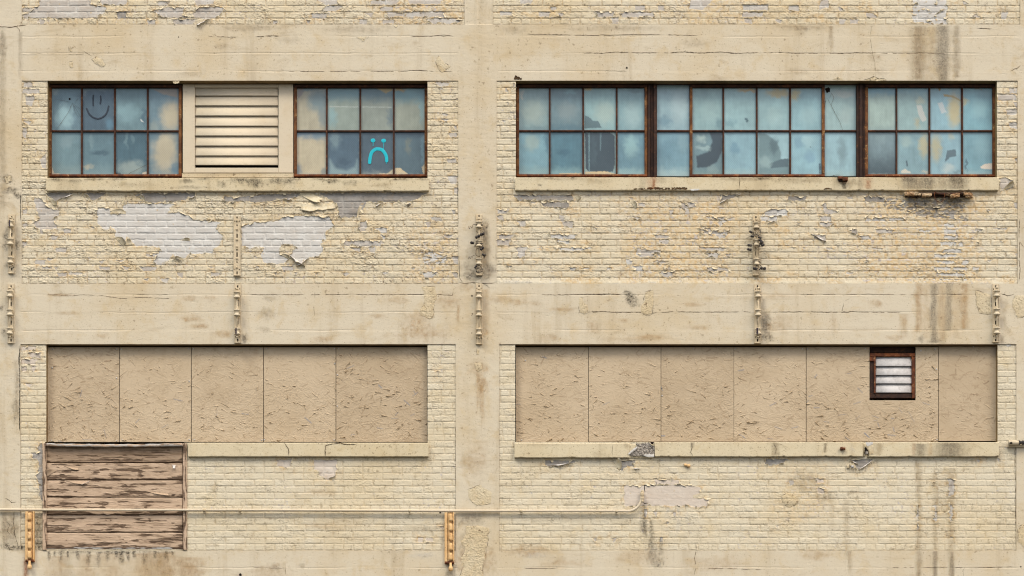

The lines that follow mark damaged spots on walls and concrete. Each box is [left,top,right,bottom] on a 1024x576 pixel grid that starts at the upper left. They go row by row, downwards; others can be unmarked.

peeling [22,0,127,24]
peeling [147,0,226,27]
peeling [359,0,463,27]
peeling [911,0,948,24]
peeling [629,187,699,219]
rust [904,190,973,203]
peeling [21,191,223,283]
peeling [222,192,426,276]
peeling [847,195,1007,281]
spalling [613,442,655,471]
peeling [847,442,874,471]
peeling [622,476,711,524]